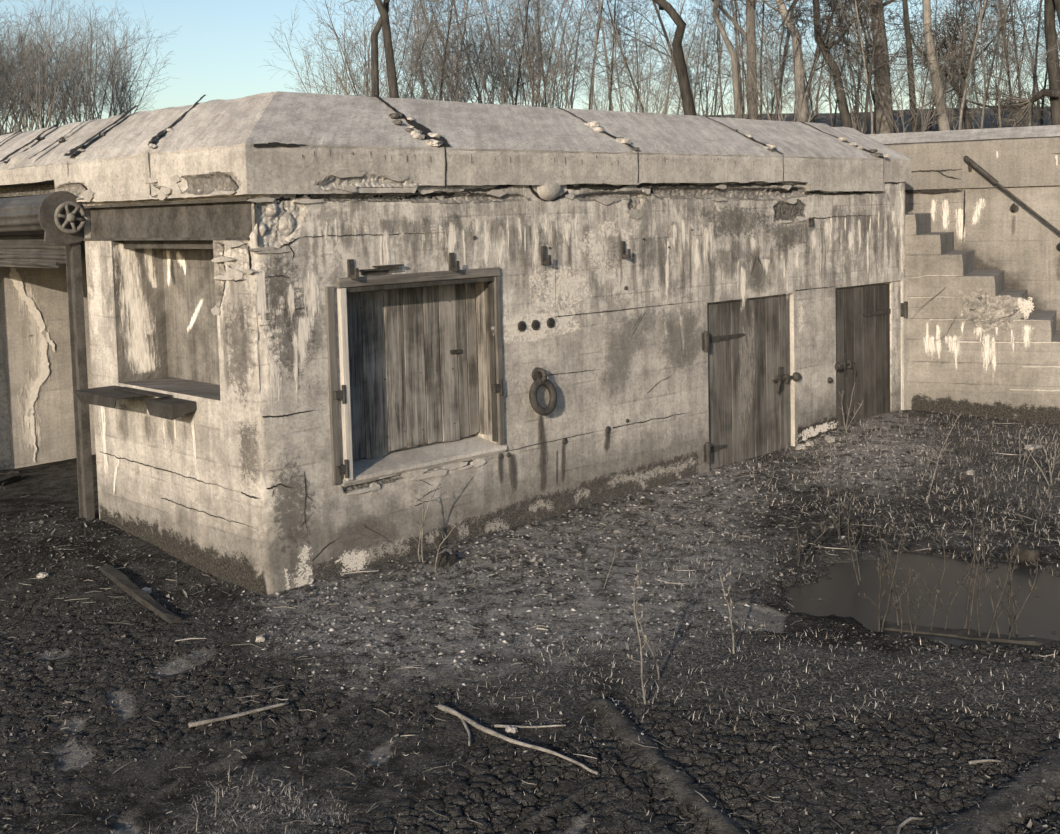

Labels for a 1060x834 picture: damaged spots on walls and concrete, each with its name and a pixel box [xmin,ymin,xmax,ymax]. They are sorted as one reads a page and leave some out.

spalling [141,171,238,201]
crack [228,194,443,300]
spalling [211,169,532,406]
water stain [350,214,640,312]
crack [254,95,965,244]
spalling [565,184,811,251]
water stain [930,198,998,270]
efflorescence [255,271,320,405]
water stain [924,321,998,371]
water stain [1011,325,1031,352]
water stain [608,457,697,489]
efflorescence [282,545,313,591]